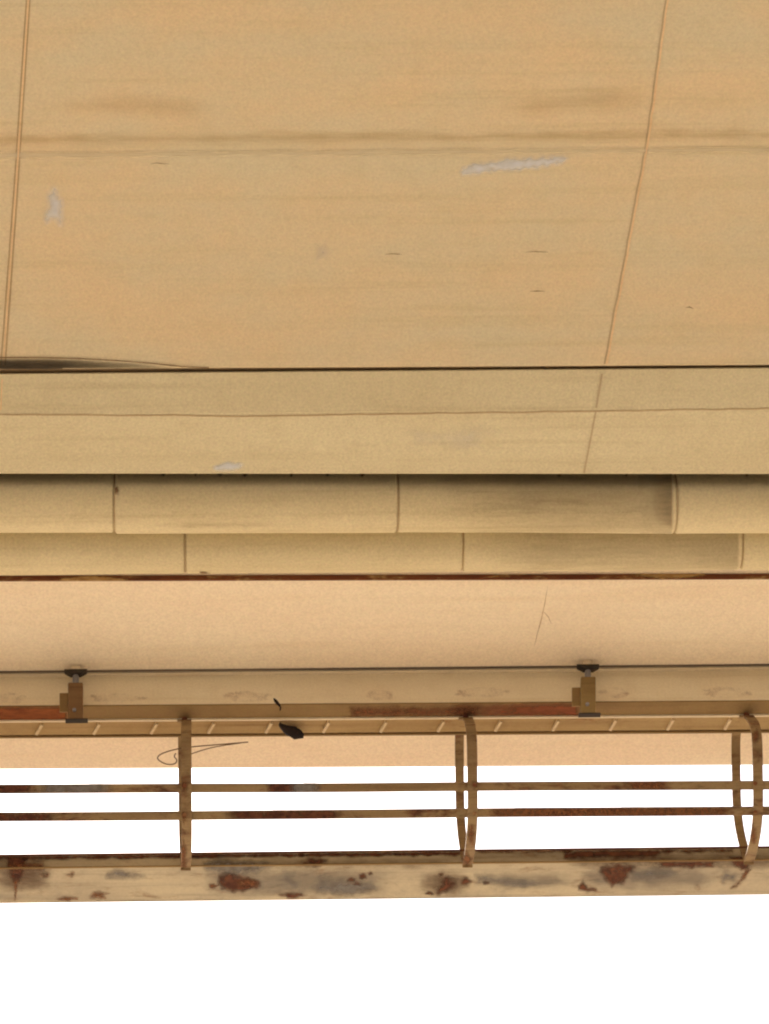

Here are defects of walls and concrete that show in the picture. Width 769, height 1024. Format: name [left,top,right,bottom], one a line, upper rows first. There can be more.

damp [0,357,209,369]
rust [0,827,749,898]